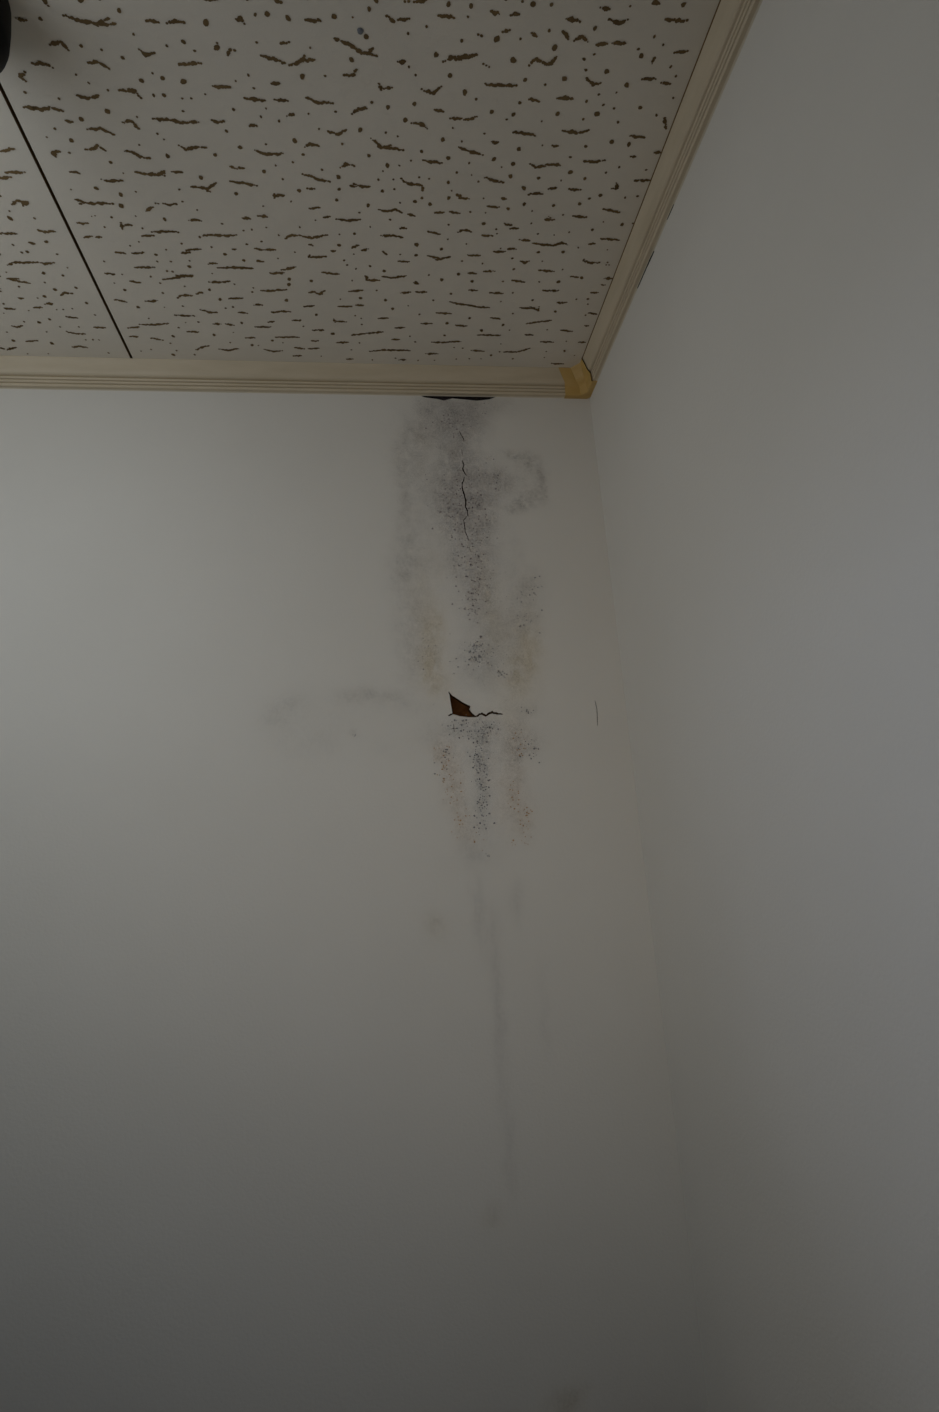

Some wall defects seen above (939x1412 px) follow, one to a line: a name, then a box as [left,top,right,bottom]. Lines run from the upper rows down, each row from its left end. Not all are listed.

crack [459,431,471,552]
spalling [448,692,503,718]
damp [434,719,500,835]